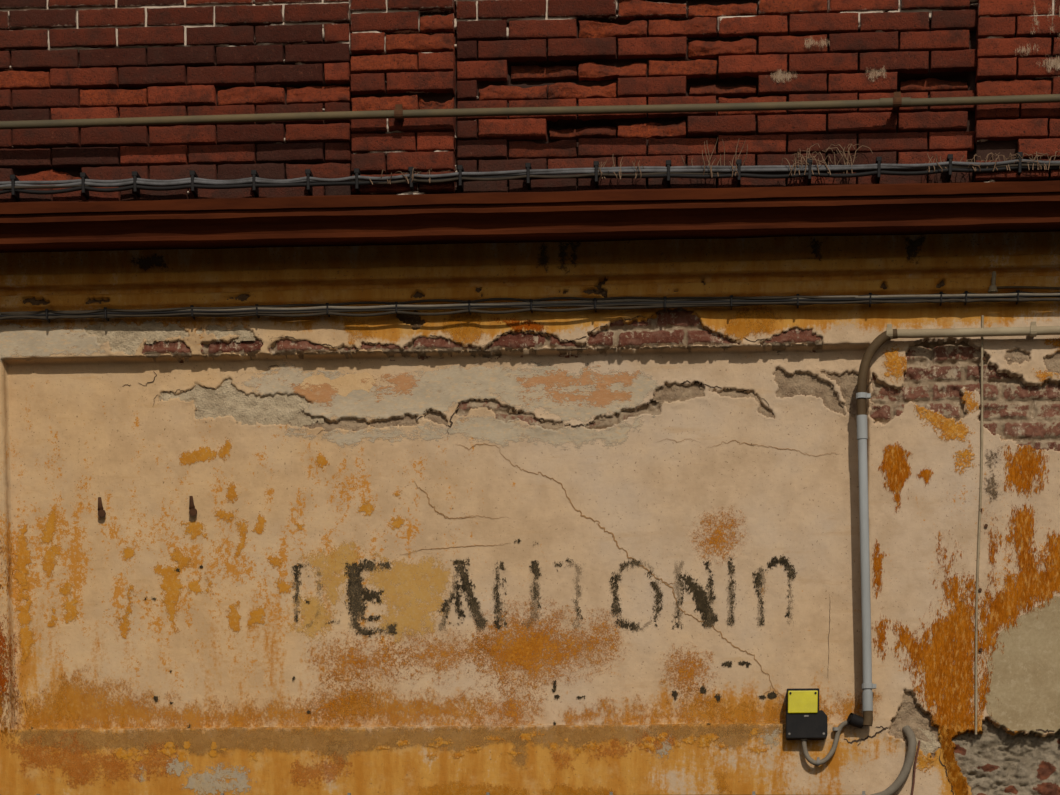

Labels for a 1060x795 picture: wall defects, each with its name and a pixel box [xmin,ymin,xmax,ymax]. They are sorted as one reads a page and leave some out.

leakage [770,69,796,82]
leakage [1039,57,1060,72]
peeling [142,291,775,450]
crack [647,380,773,414]
flaking render [761,328,823,353]
flaking render [773,339,1060,451]
leakage [985,451,998,502]
peeling [12,508,79,665]
peeling [114,518,213,639]
crack [402,398,785,699]
leakage [6,723,786,788]
flaking render [888,691,1060,795]